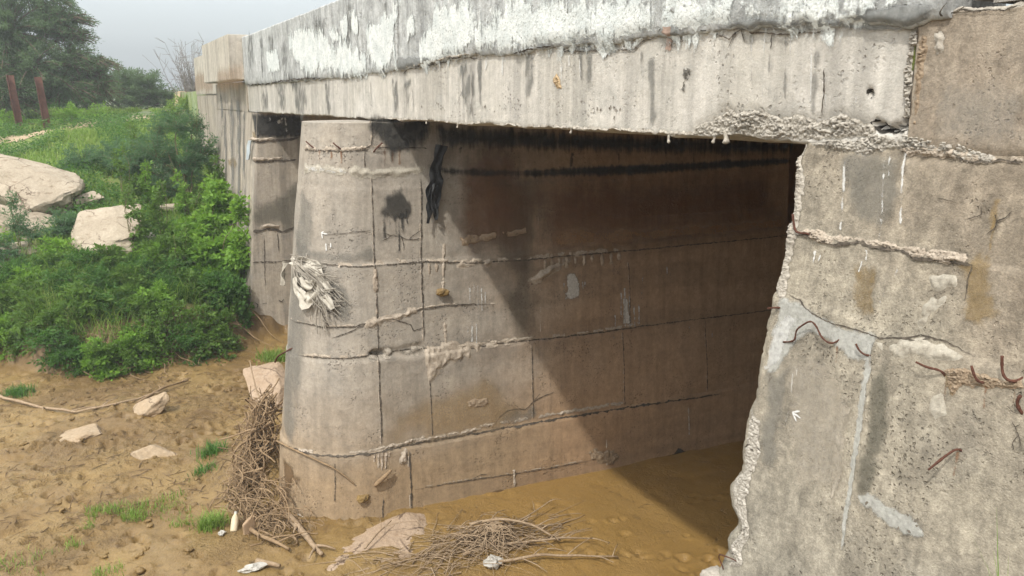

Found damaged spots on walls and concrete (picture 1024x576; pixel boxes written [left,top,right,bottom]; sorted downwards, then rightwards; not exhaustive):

leakage [662,25,681,51]
spalling [377,105,995,309]
crack [788,294,975,357]
spalling [718,409,761,570]